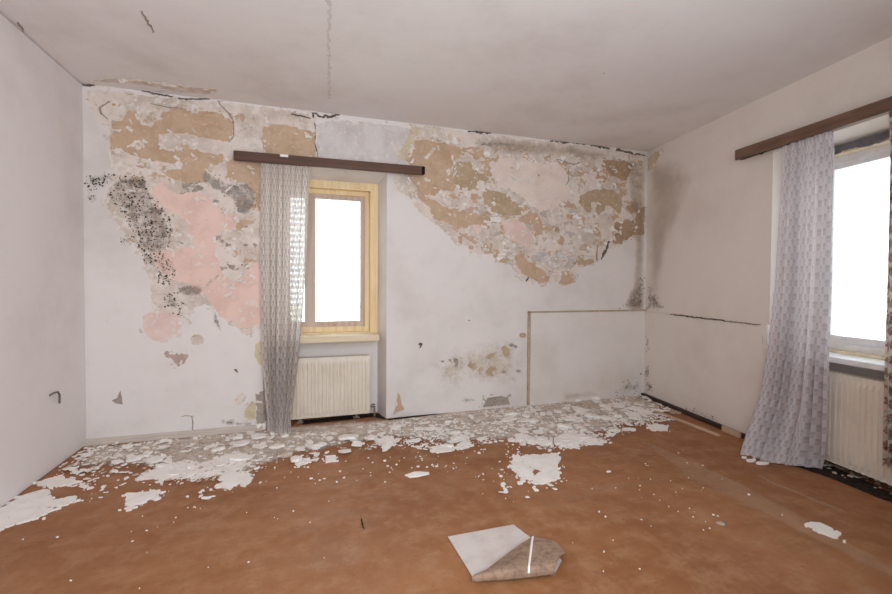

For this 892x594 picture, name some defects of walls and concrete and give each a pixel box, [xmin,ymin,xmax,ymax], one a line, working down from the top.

water stain [84,174,200,316]
peeling [85,77,663,369]
peeling [393,393,404,415]
peeling [441,333,526,377]